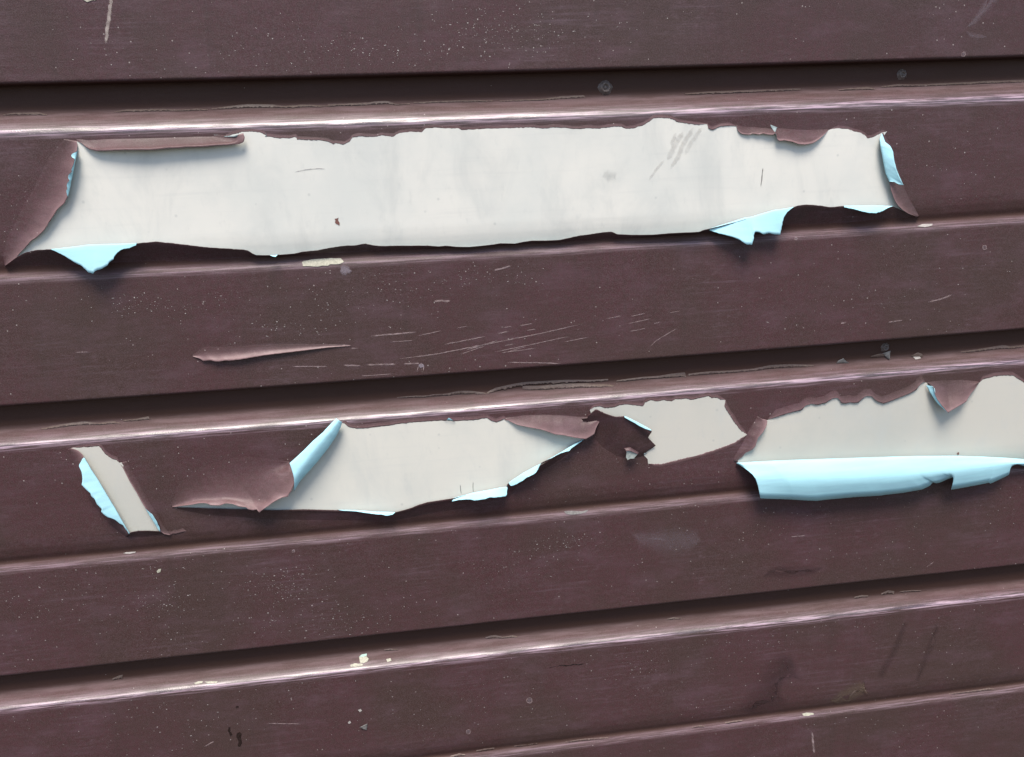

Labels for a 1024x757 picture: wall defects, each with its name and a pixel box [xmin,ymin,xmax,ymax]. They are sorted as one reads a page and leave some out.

peeling [3,114,932,274]
peeling [68,443,186,537]
peeling [171,372,1024,520]